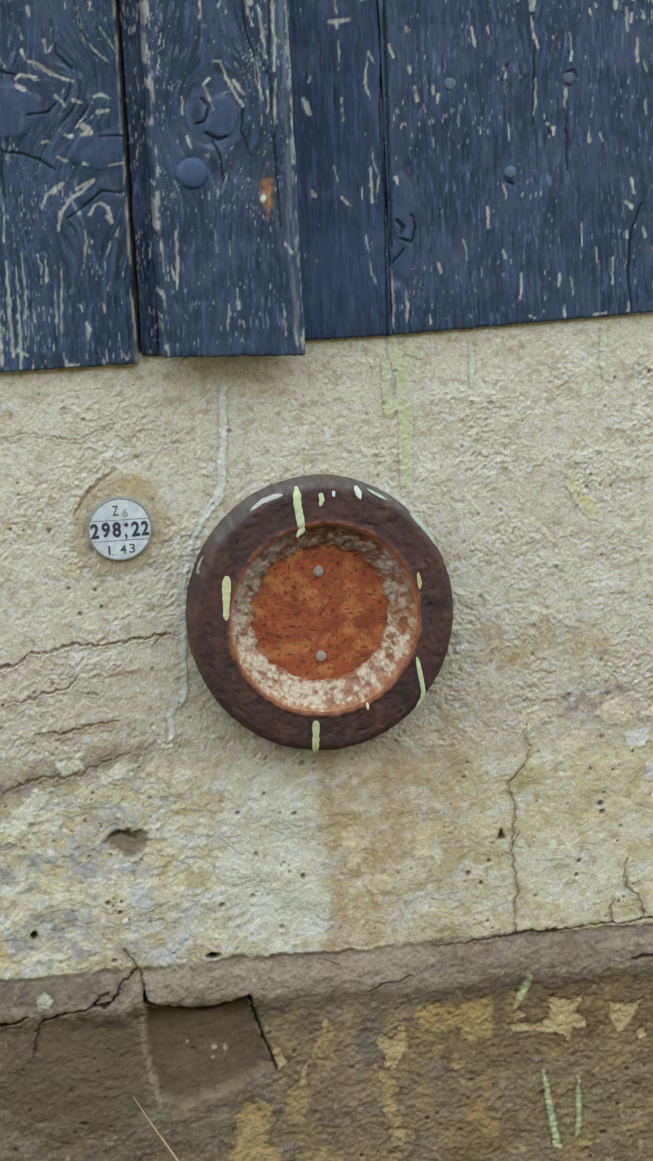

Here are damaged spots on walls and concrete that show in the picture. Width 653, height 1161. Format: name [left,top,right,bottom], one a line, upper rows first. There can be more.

crack [0,631,179,738]
crack [1,752,132,797]
crack [431,721,653,949]
crack [0,949,279,1070]
flaking render [138,977,348,1161]
flaking render [373,993,588,1161]
flaking render [607,996,648,1040]